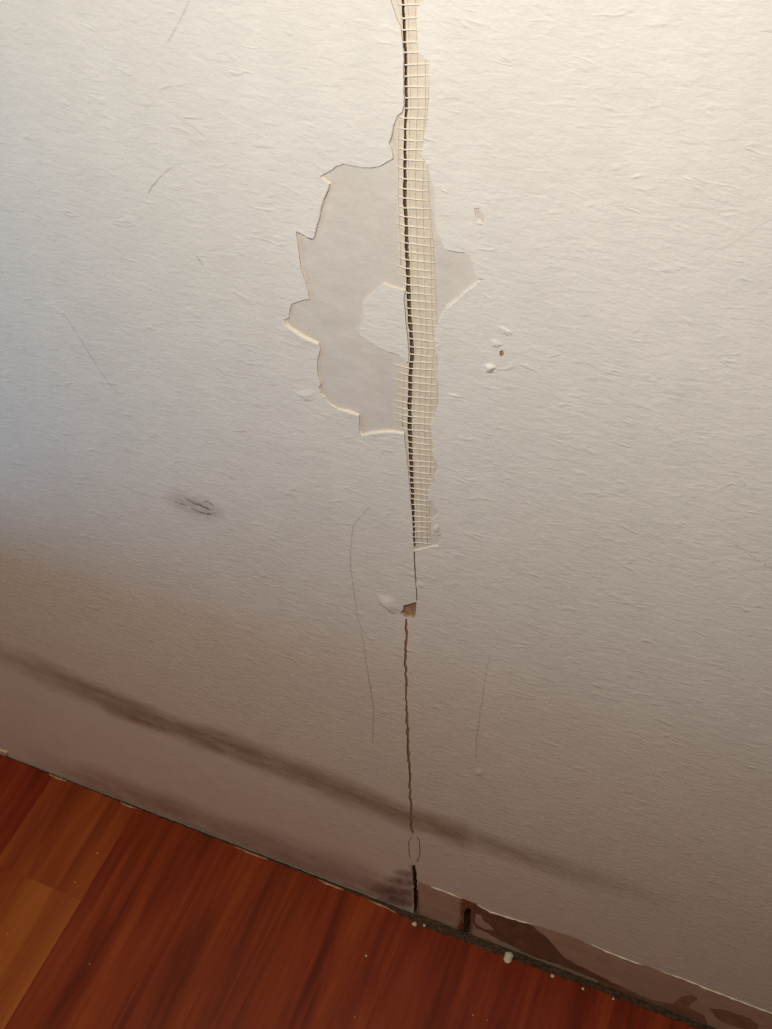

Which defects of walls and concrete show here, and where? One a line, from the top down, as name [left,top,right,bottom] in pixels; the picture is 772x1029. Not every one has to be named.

peeling [276,0,442,551]
crack [402,0,421,914]
peeling [427,165,484,325]